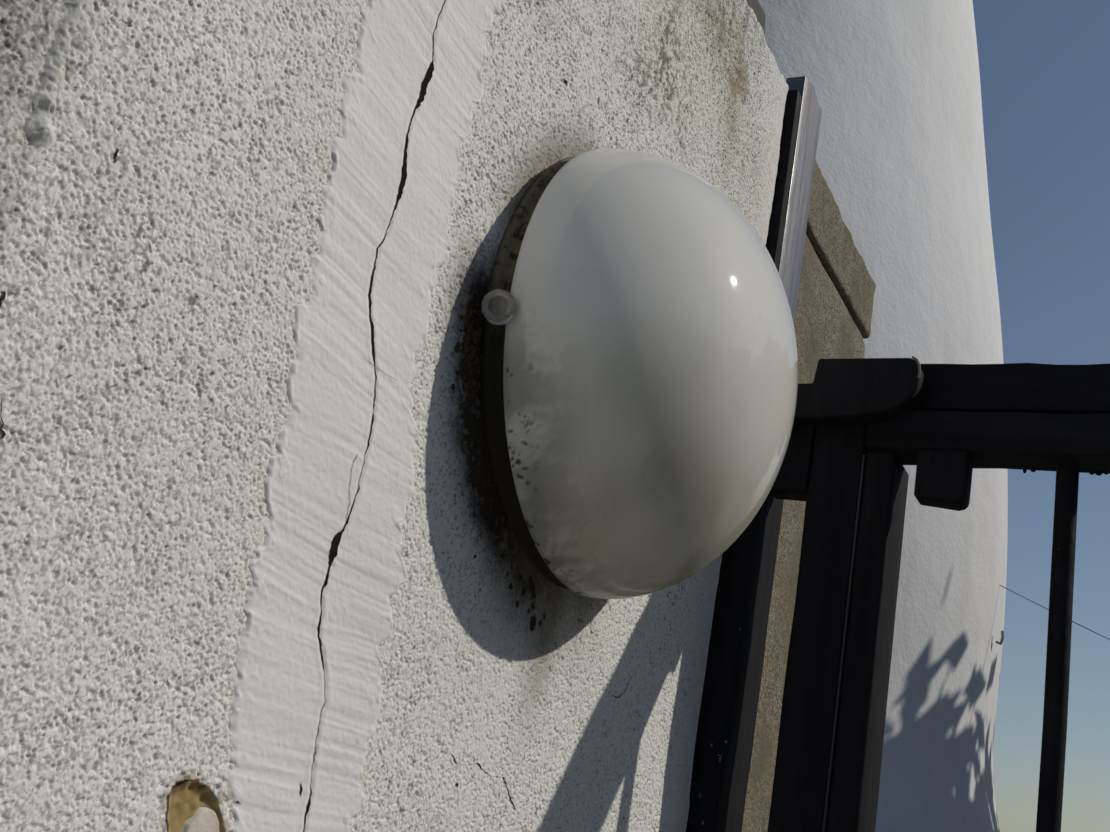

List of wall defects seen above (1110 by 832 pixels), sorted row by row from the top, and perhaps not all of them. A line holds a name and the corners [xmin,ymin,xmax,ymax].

crack [300,0,446,831]
crack [406,742,516,809]